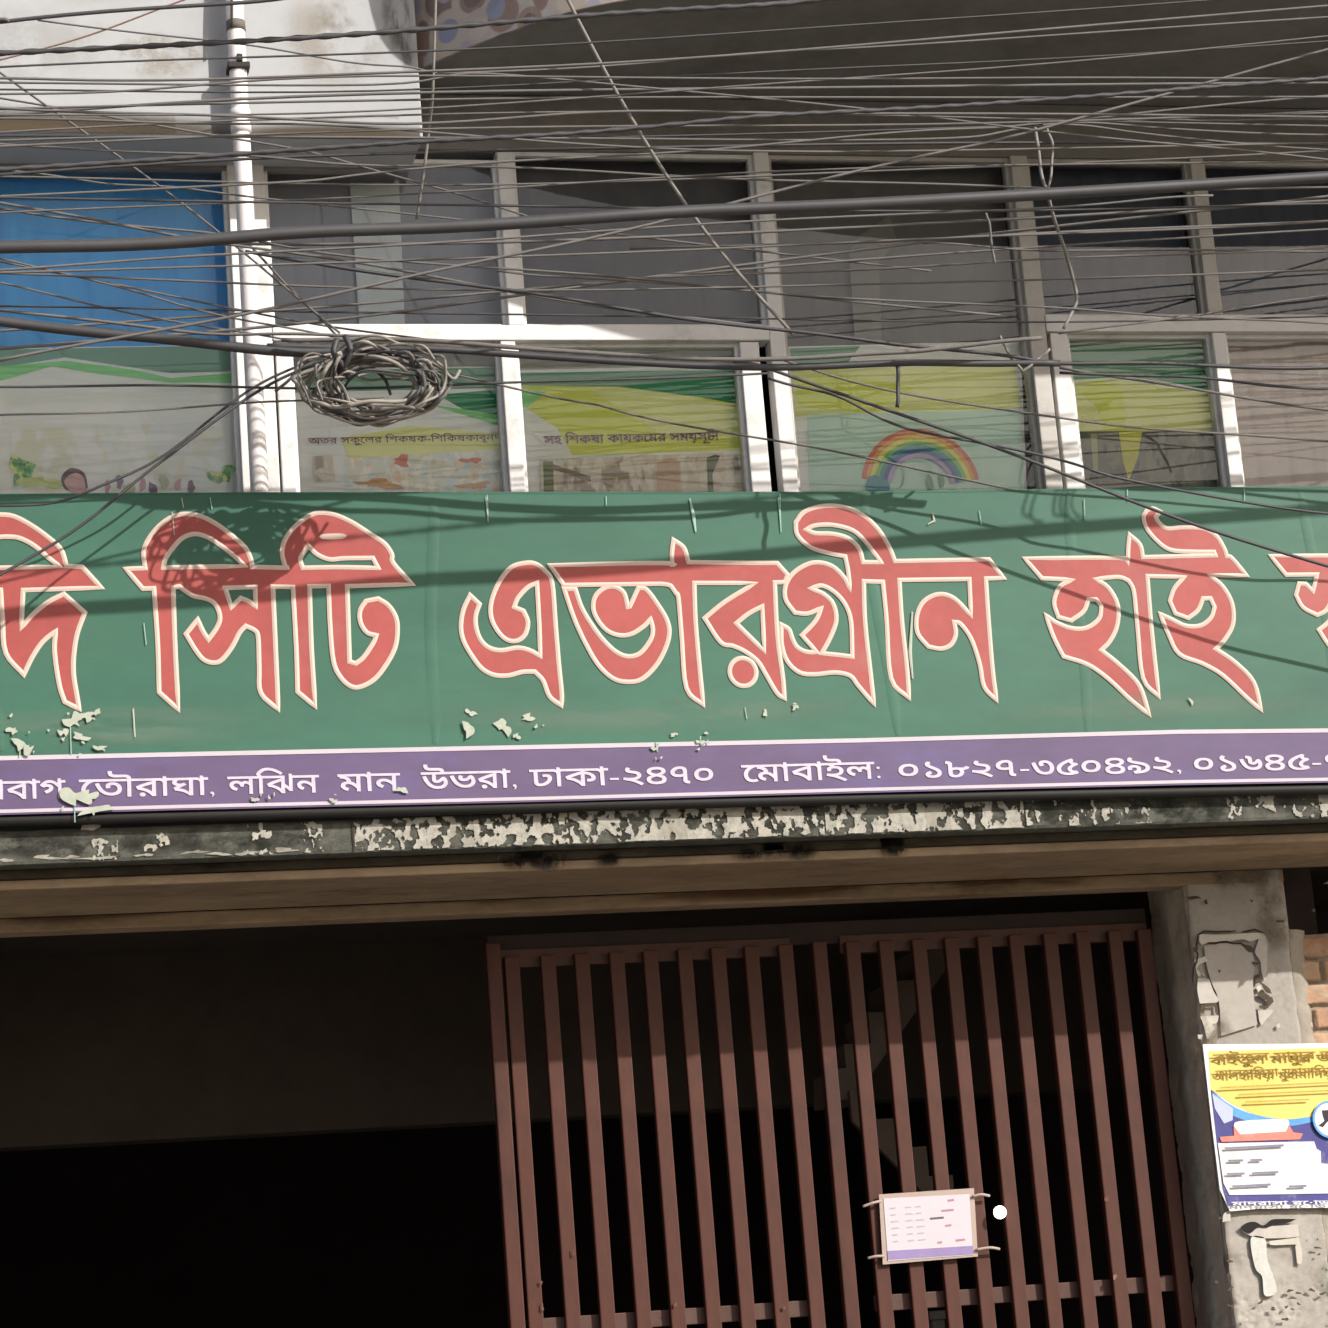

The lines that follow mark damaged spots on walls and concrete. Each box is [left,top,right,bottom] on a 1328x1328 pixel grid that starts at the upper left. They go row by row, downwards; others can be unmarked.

peeling [5,713,35,757]
peeling [47,708,107,755]
peeling [462,709,477,739]
peeling [493,713,545,739]
peeling [33,787,323,860]
peeling [354,800,1151,851]
peeling [1226,795,1328,819]
peeling [1193,933,1280,1040]